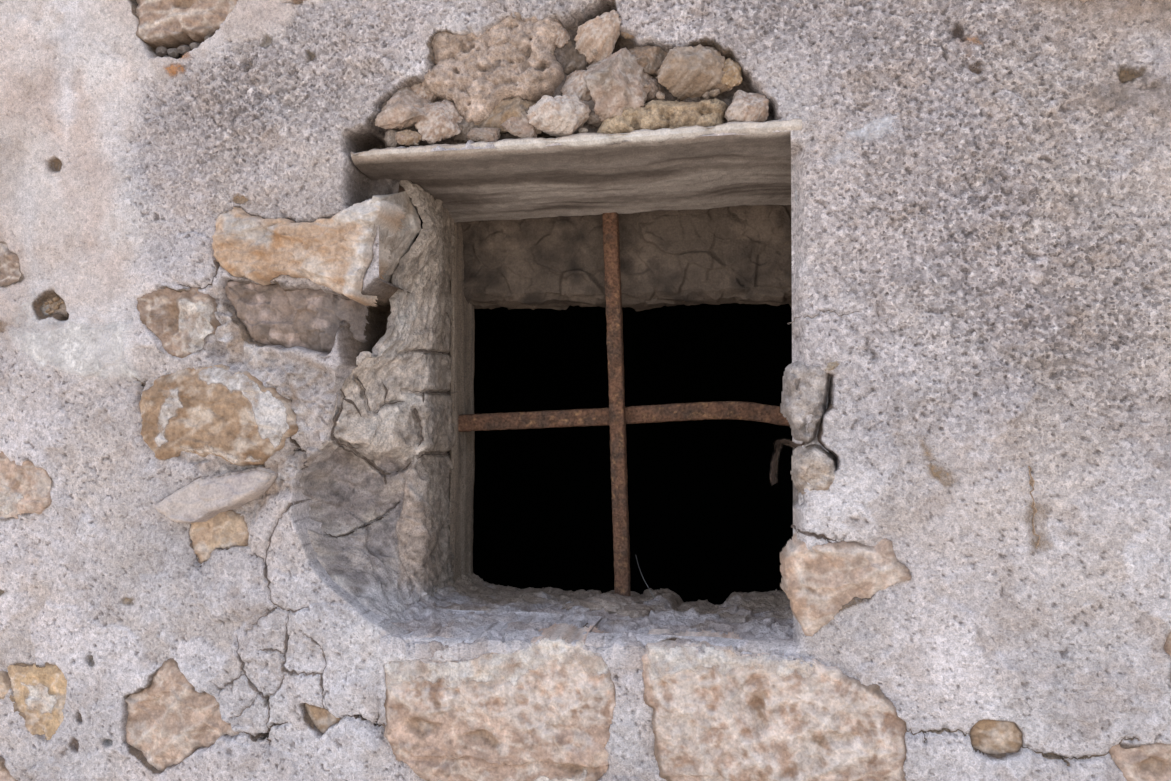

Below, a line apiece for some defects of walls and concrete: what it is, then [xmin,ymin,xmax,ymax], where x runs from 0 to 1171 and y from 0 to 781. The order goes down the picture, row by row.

spalling [130,0,238,58]
spalling [369,0,769,148]
spalling [137,191,421,564]
crack [289,437,308,470]
crack [325,376,458,538]
crack [219,499,382,743]
spalling [780,533,912,636]
spalling [0,662,82,740]
spalling [103,658,240,774]
spalling [382,622,616,781]
spalling [642,629,907,781]
spalling [1108,738,1171,781]